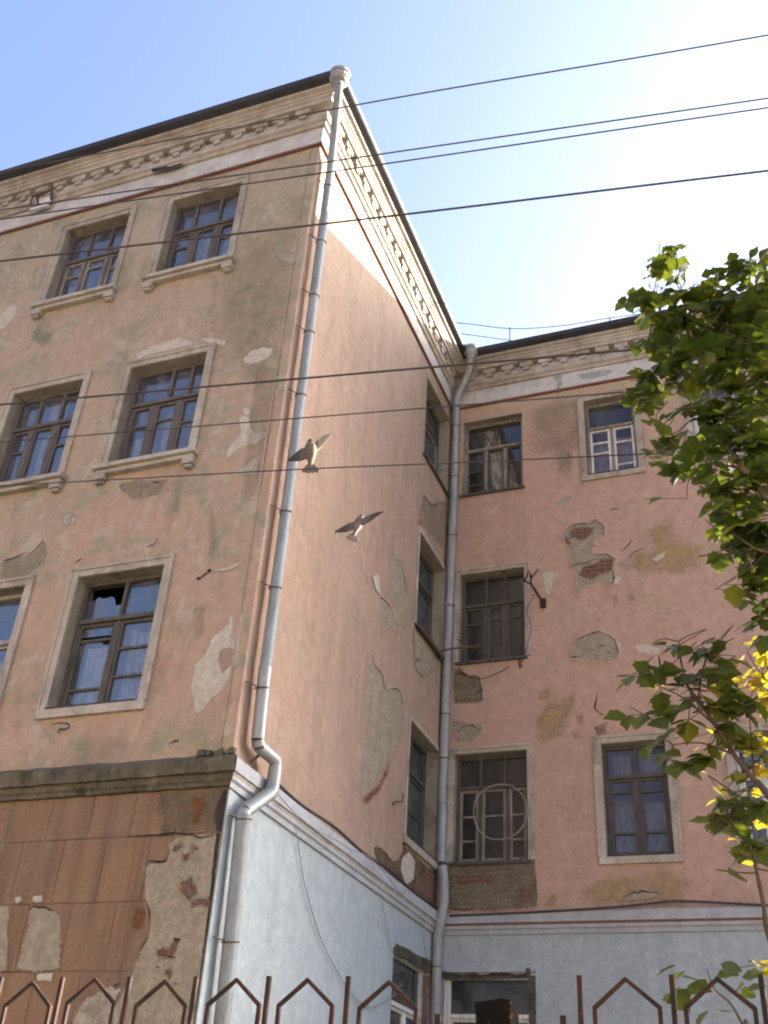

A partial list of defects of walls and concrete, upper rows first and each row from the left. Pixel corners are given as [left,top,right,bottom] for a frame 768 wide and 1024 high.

peeling [226,407,266,458]
flaking render [0,540,46,578]
flaking render [542,515,643,598]
flaking render [372,574,400,638]
peeling [191,613,243,714]
flaking render [453,667,483,704]
flaking render [565,627,661,667]
flaking render [355,651,405,802]
flaking render [0,895,63,982]
flaking render [73,790,227,1024]
flaking render [375,846,538,913]